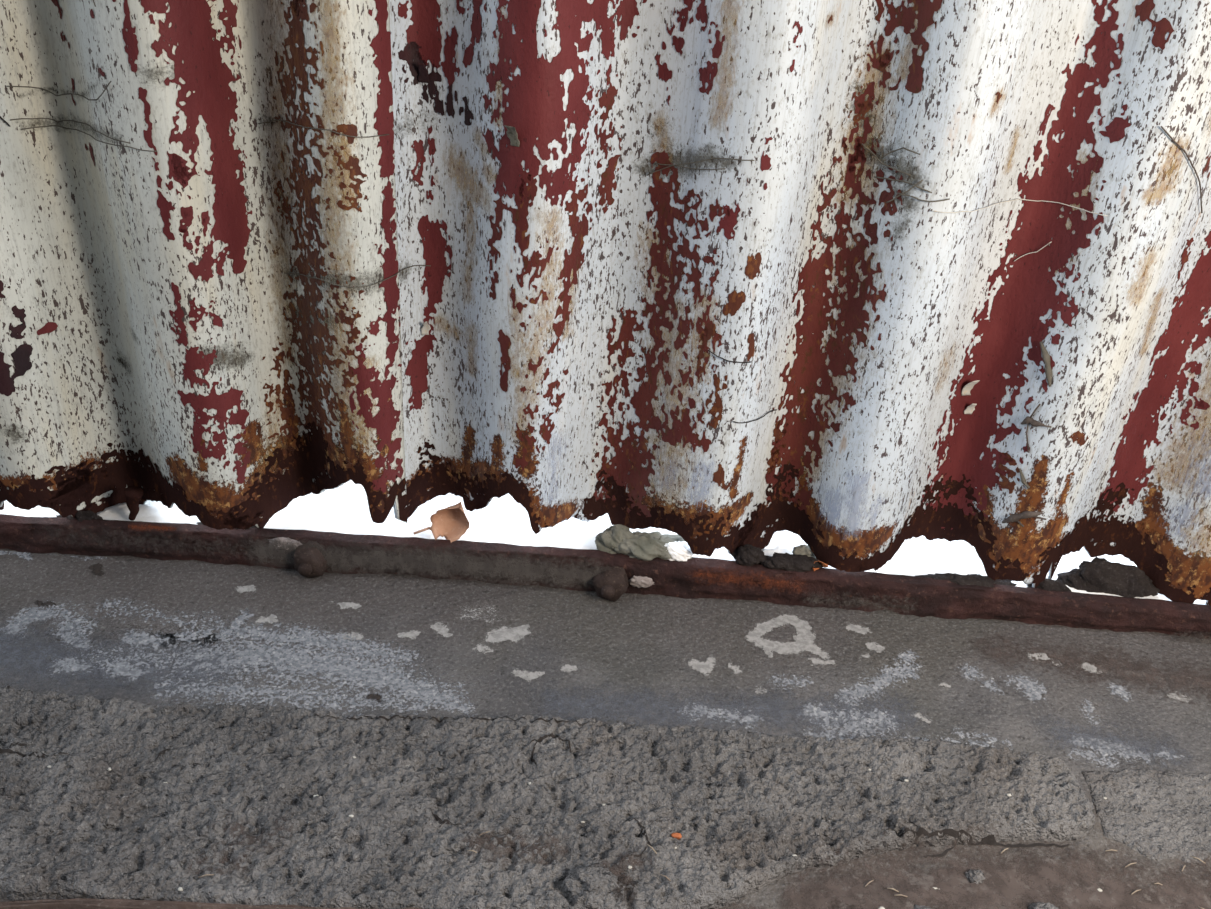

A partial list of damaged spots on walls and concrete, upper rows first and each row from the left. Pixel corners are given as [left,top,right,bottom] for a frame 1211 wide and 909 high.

peeling [0,278,58,396]
peeling [112,0,252,282]
peeling [169,282,251,484]
peeling [347,0,647,493]
rust [0,0,1211,605]
peeling [590,150,762,517]
peeling [655,0,725,111]
peeling [760,137,773,190]
peeling [765,0,943,514]
peeling [921,0,1174,520]
peeling [1099,231,1211,517]
crack [882,818,1070,857]